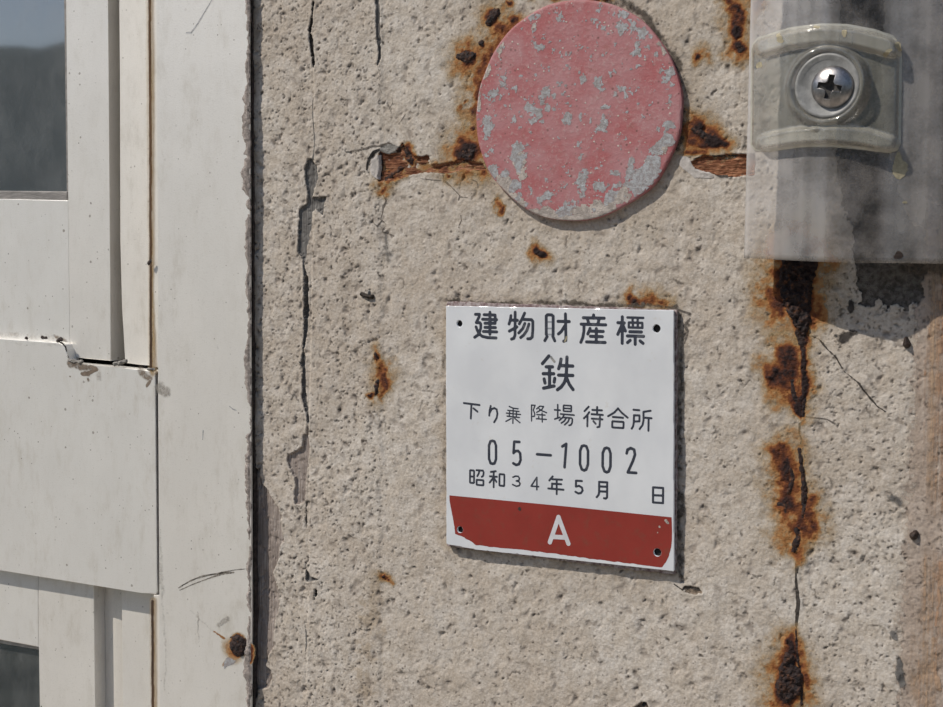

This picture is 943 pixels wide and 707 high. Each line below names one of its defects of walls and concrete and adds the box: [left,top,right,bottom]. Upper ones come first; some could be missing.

crack [308,0,316,68]
corrosion [692,0,770,69]
corrosion [440,0,524,184]
corrosion [679,108,736,156]
crack [287,101,327,528]
corrosion [365,344,394,403]
corrosion [751,217,843,567]
crack [798,416,835,443]
water stain [887,214,943,707]
crack [305,562,318,597]
crack [793,566,801,626]
corrosion [757,625,819,707]